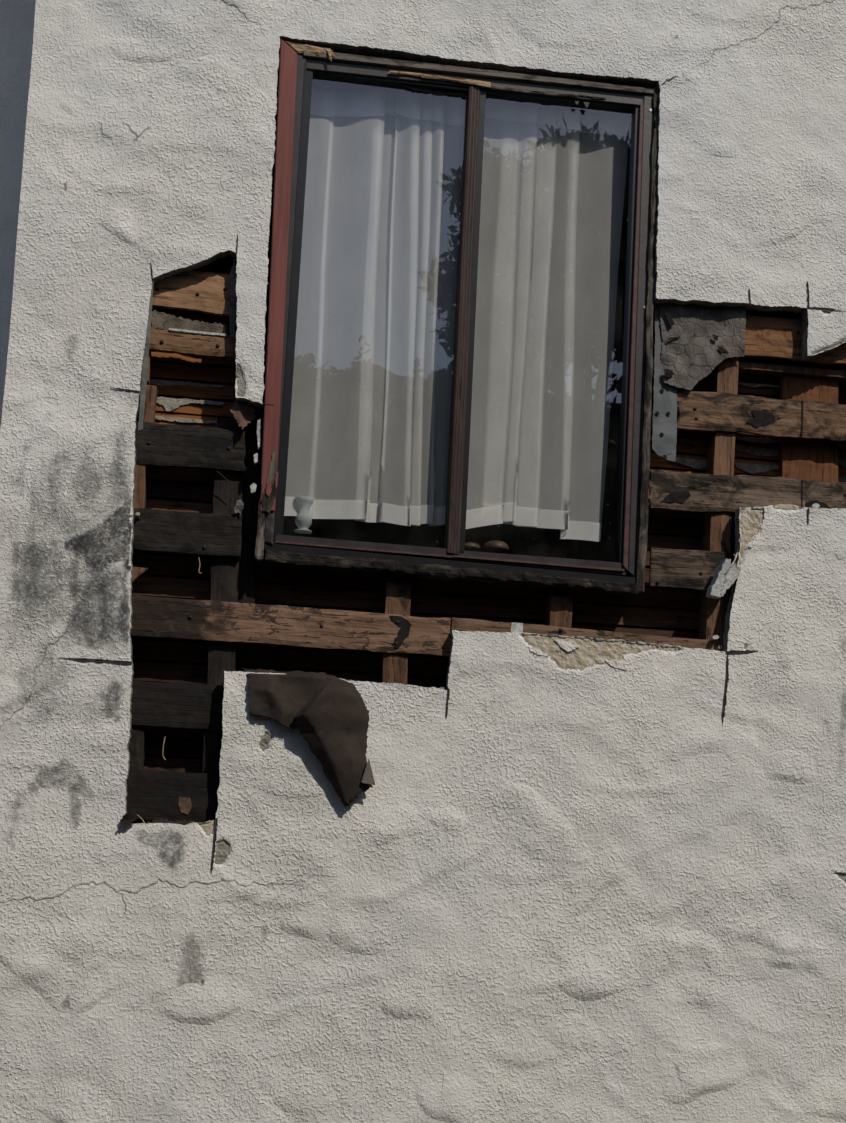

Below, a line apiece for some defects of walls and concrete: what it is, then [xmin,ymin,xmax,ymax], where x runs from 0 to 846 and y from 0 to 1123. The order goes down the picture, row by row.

crack [662,0,834,84]
spalling [236,365,246,397]
peeling [261,472,278,497]
spalling [739,503,801,566]
spalling [520,634,681,671]
spalling [258,732,272,752]